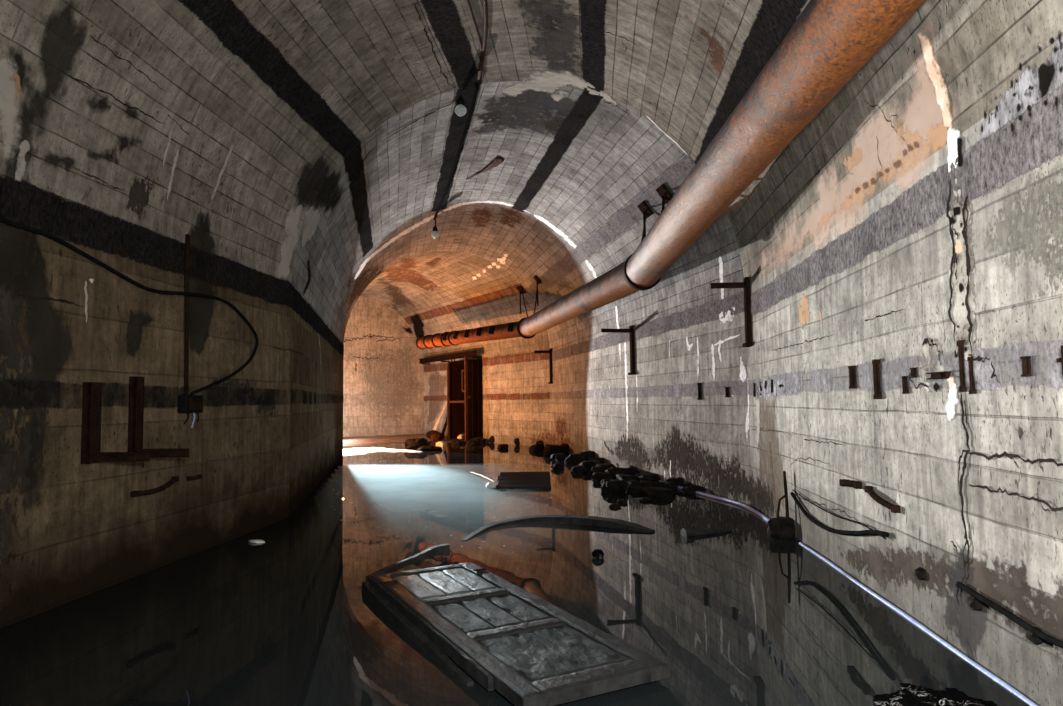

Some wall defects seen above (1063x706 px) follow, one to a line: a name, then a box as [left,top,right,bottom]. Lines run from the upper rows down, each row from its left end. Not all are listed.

leakage [0,3,86,182]
leakage [89,98,110,111]
leakage [88,136,138,164]
leakage [125,103,138,118]
leakage [277,156,343,278]
spalling [855,142,919,194]
crack [946,179,983,361]
spalling [981,31,1063,139]
leakage [604,342,784,518]
crack [951,392,1063,583]